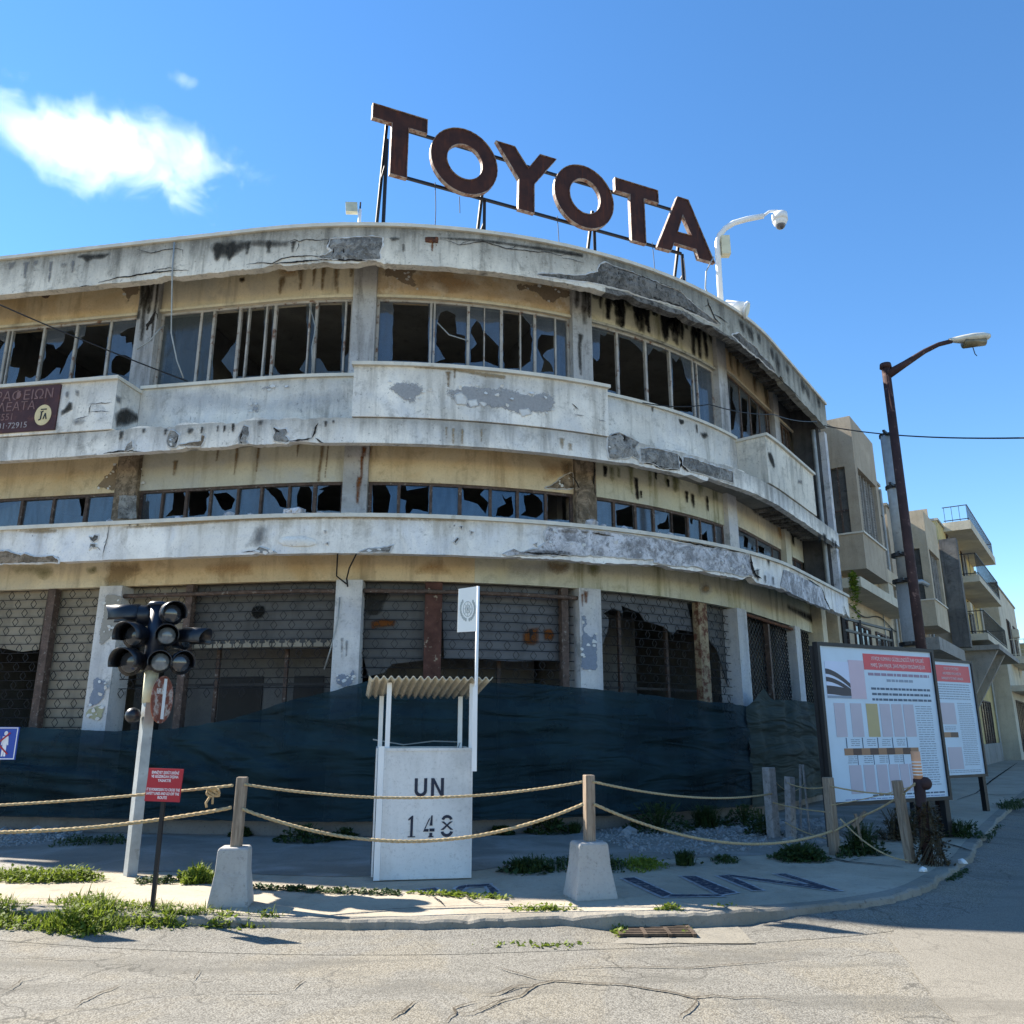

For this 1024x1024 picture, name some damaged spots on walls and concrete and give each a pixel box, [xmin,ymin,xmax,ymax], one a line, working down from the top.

water stain [213,241,296,260]
crack [246,239,329,265]
spalling [318,235,418,290]
water stain [576,291,712,359]
spalling [517,261,801,412]
peeling [388,380,433,402]
peeling [447,383,555,417]
peeling [97,440,141,490]
corrosion [356,447,366,502]
spalling [606,432,734,484]
spalling [502,525,754,578]
peeling [781,570,830,610]